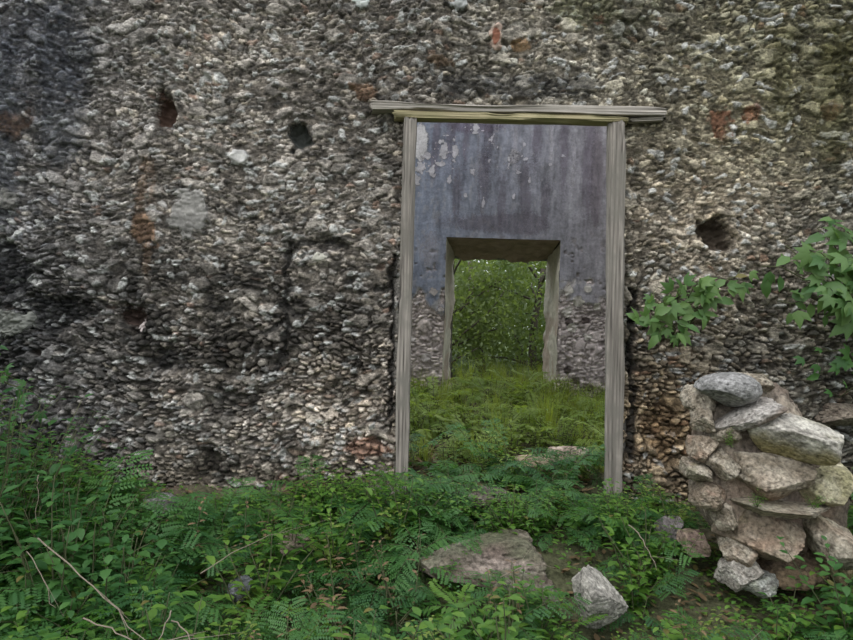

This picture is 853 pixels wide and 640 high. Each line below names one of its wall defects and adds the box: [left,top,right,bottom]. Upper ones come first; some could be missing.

peeling [415,124,465,193]
spalling [410,287,445,398]
spalling [556,280,606,401]